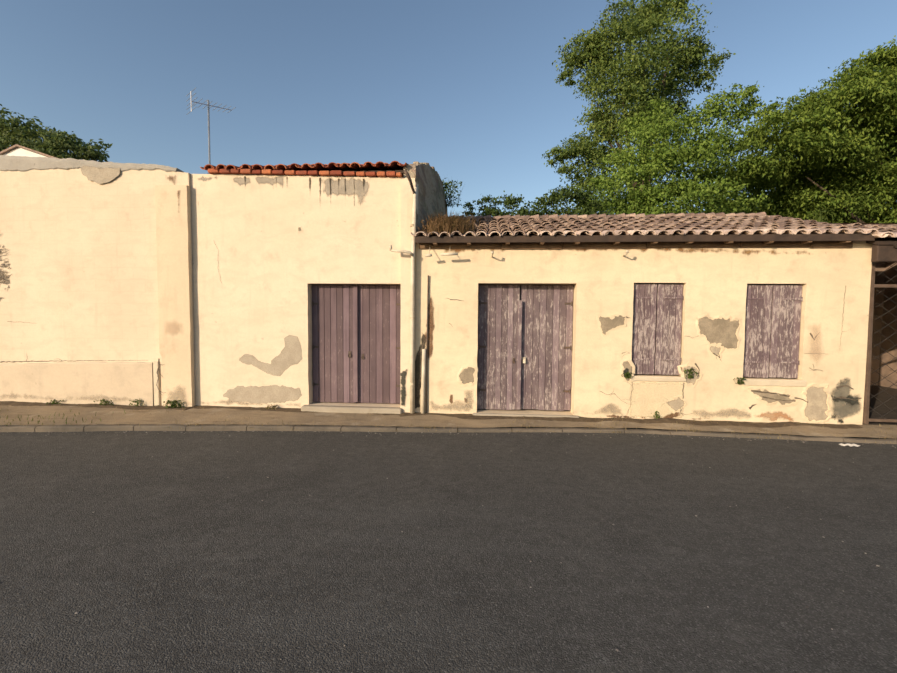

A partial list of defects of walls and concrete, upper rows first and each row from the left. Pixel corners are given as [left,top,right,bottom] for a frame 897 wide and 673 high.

water stain [309,178,369,204]
spalling [596,313,628,337]
spalling [695,314,742,360]
spalling [457,364,478,387]
spalling [742,383,832,424]
water stain [831,379,861,423]